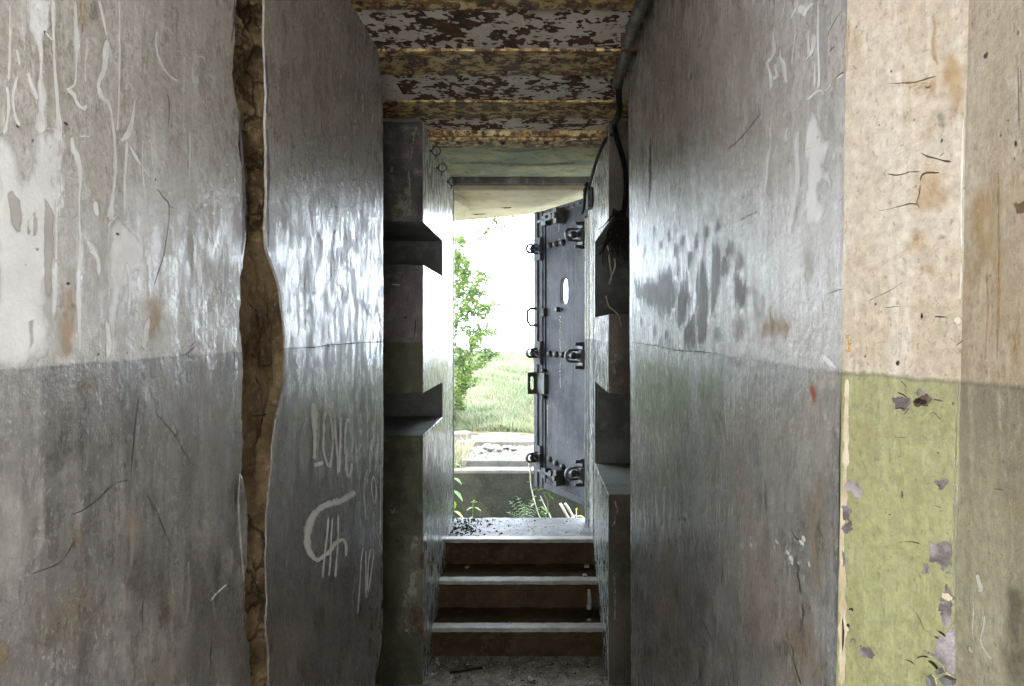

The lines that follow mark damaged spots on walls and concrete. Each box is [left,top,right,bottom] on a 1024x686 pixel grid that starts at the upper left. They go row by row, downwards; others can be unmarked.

peeling [356,10,632,49]
peeling [393,75,626,100]
peeling [418,118,611,130]
crack [231,0,380,686]
spalling [892,381,959,433]
peeling [837,379,875,686]
spalling [907,450,957,686]